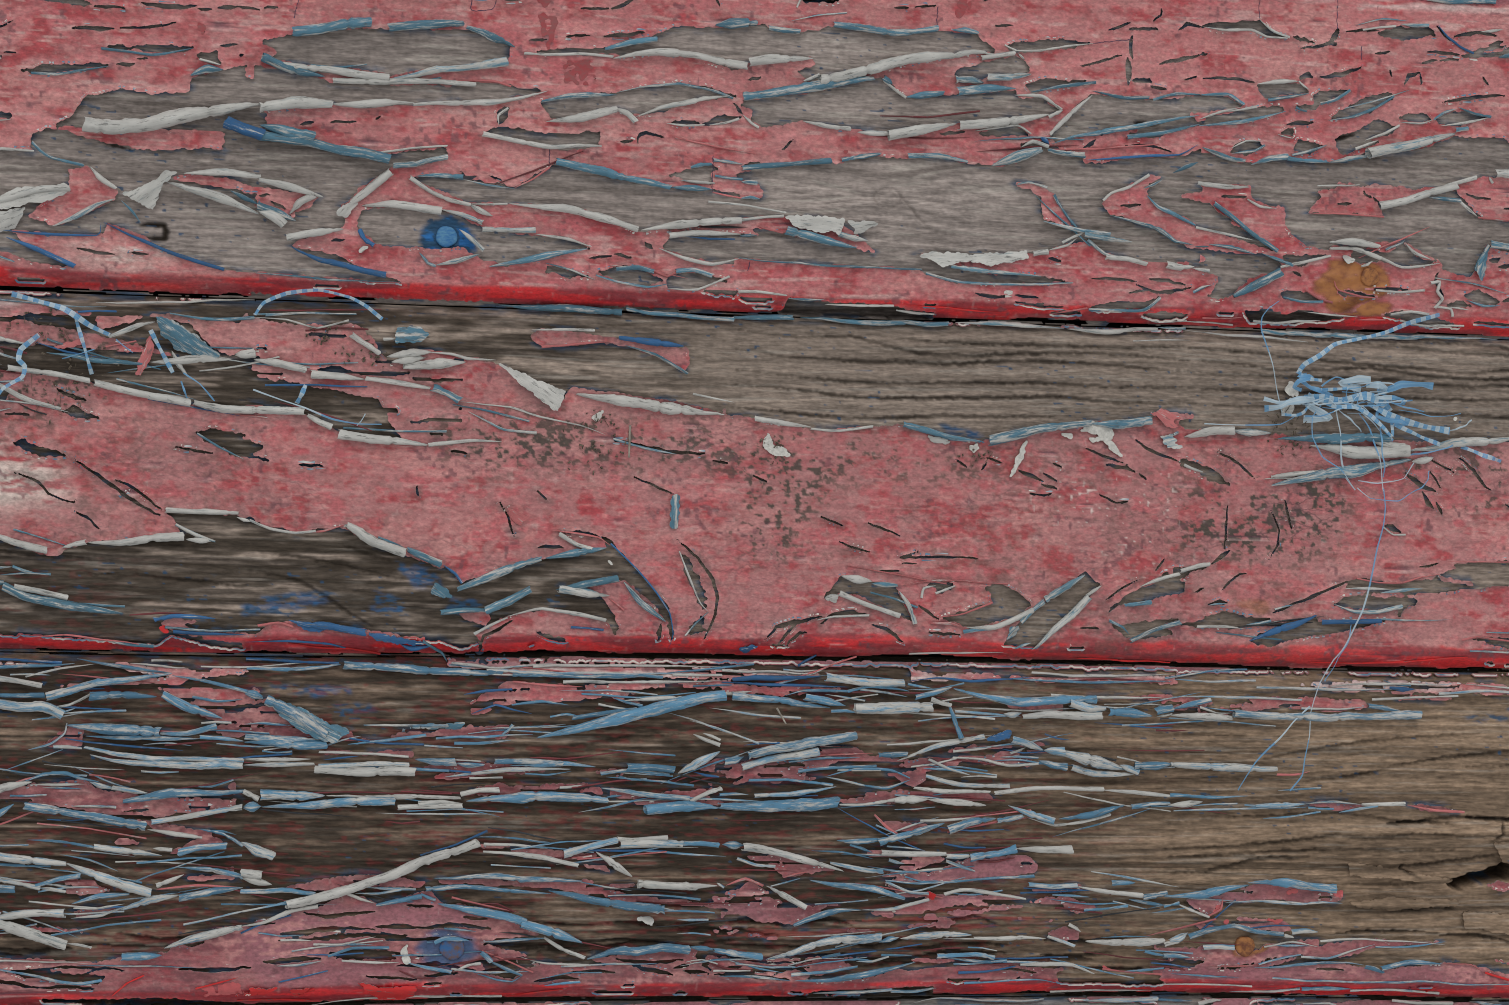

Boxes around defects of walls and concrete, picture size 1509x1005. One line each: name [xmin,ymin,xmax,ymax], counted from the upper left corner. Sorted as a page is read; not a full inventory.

peeling [0,0,1509,486]
rust [1314,260,1391,316]
peeling [0,507,1509,1005]